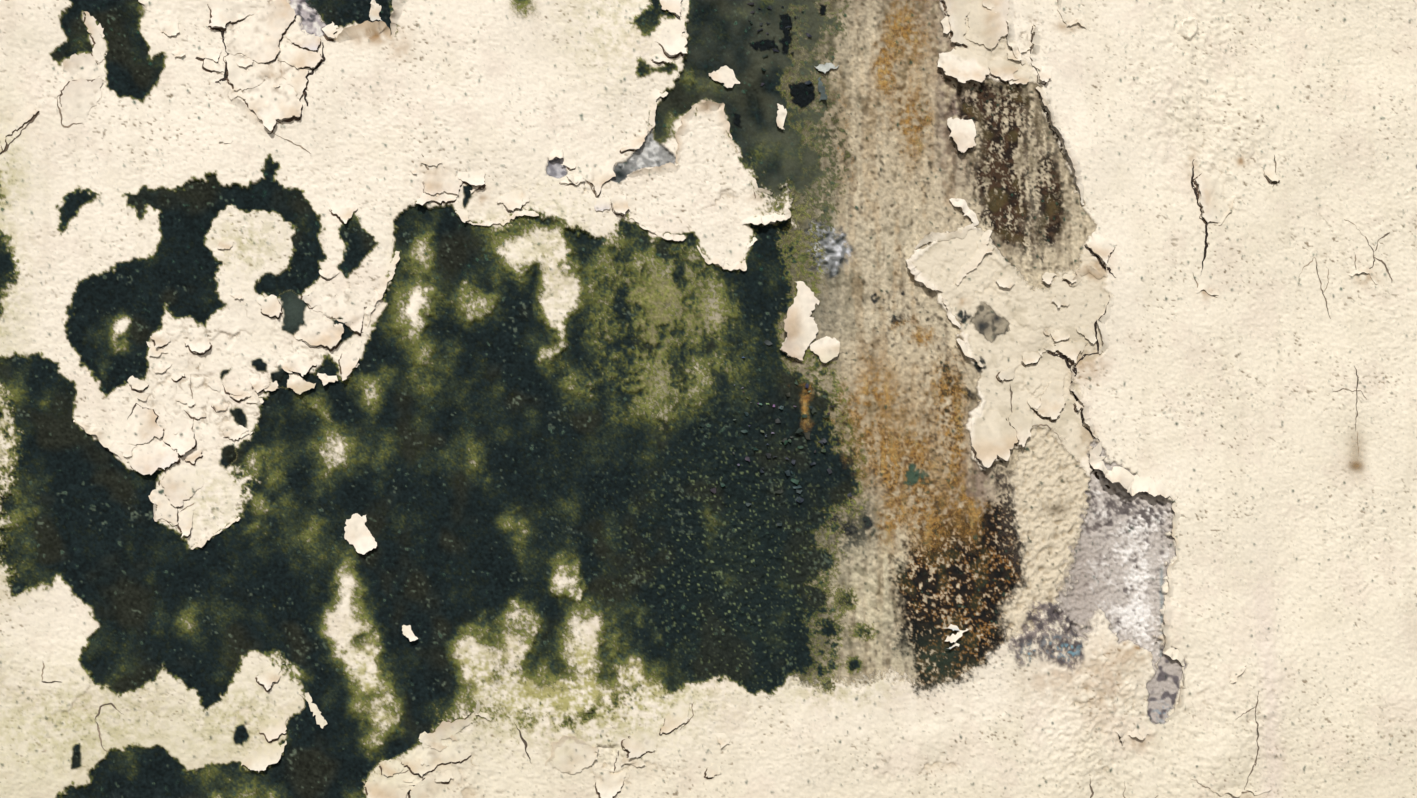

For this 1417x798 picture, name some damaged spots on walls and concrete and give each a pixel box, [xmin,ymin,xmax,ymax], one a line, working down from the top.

peeling [57,11,107,128]
peeling [138,0,408,153]
corrosion [874,6,920,94]
corrosion [899,93,931,153]
peeling [73,251,400,555]
water stain [0,0,878,798]
corrosion [802,388,811,420]
flaking render [546,0,1187,724]
corrosion [848,366,982,546]
corrosion [904,323,932,345]
water stain [941,362,972,400]
peeling [364,699,495,798]